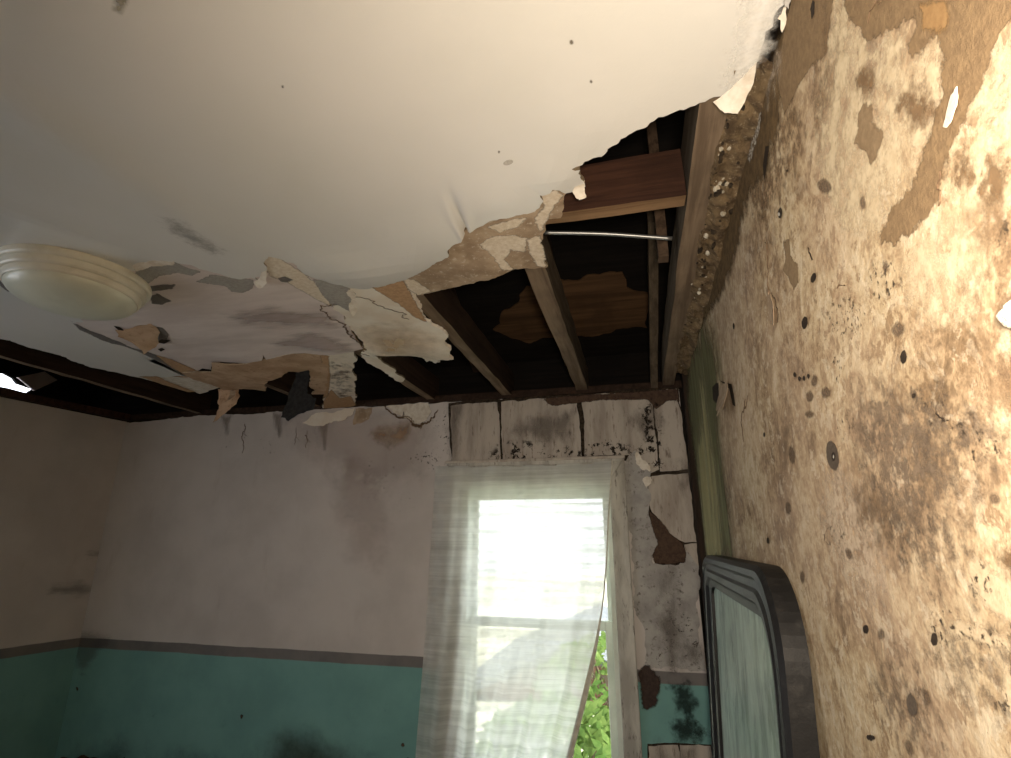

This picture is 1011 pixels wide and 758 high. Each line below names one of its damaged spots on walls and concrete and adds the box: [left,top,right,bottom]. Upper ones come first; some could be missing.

peeling [572,180,586,200]
flaking render [675,0,1011,375]
flaking render [712,379,735,416]
damp [857,385,1001,570]
peeling [448,387,705,671]
damp [638,665,660,710]
damp [672,685,703,743]